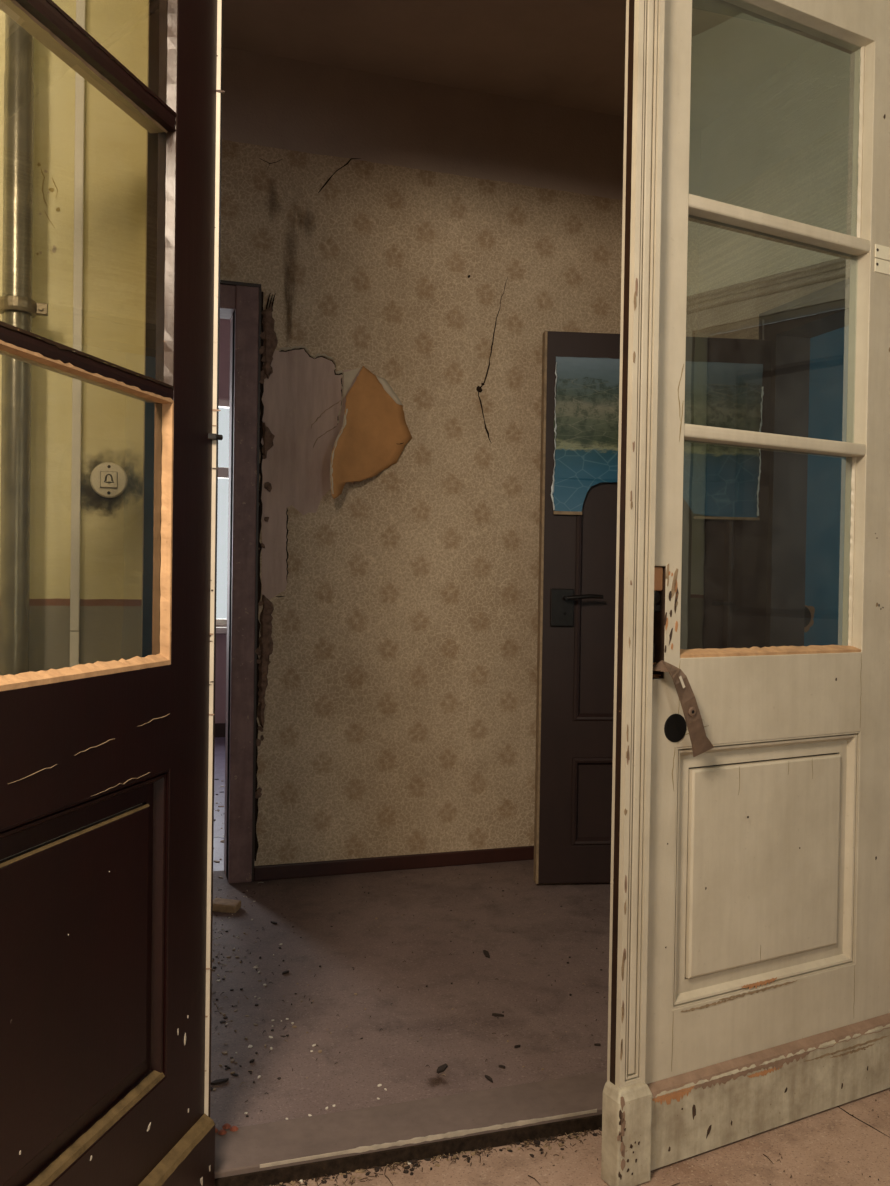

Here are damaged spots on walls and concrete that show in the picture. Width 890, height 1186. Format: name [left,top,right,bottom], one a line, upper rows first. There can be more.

crack [318,158,361,193]
crack [478,277,508,442]
flaking render [254,292,361,861]